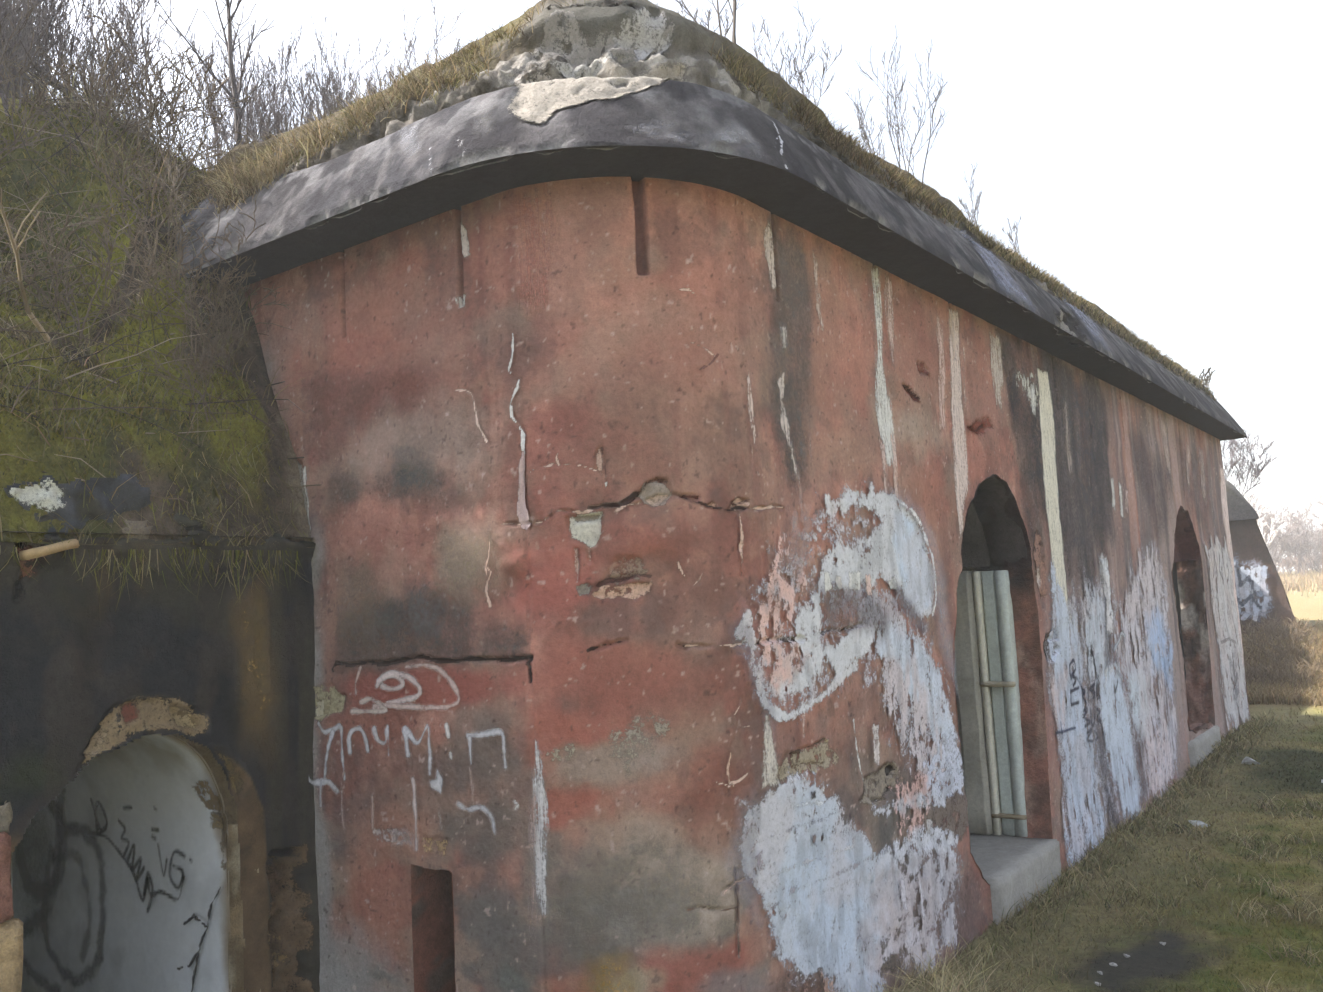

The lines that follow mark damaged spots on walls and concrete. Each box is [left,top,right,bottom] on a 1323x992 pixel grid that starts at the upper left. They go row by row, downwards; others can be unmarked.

spalling [501,0,688,123]
leakage [764,224,824,483]
efflorescence [871,269,899,499]
efflorescence [936,309,969,534]
spalling [569,512,652,599]
leakage [990,330,1128,688]
leakage [1133,415,1244,666]
spalling [82,696,209,764]
spalling [192,780,227,870]
crack [332,654,534,683]
peeling [777,738,839,780]
spalling [266,843,314,992]